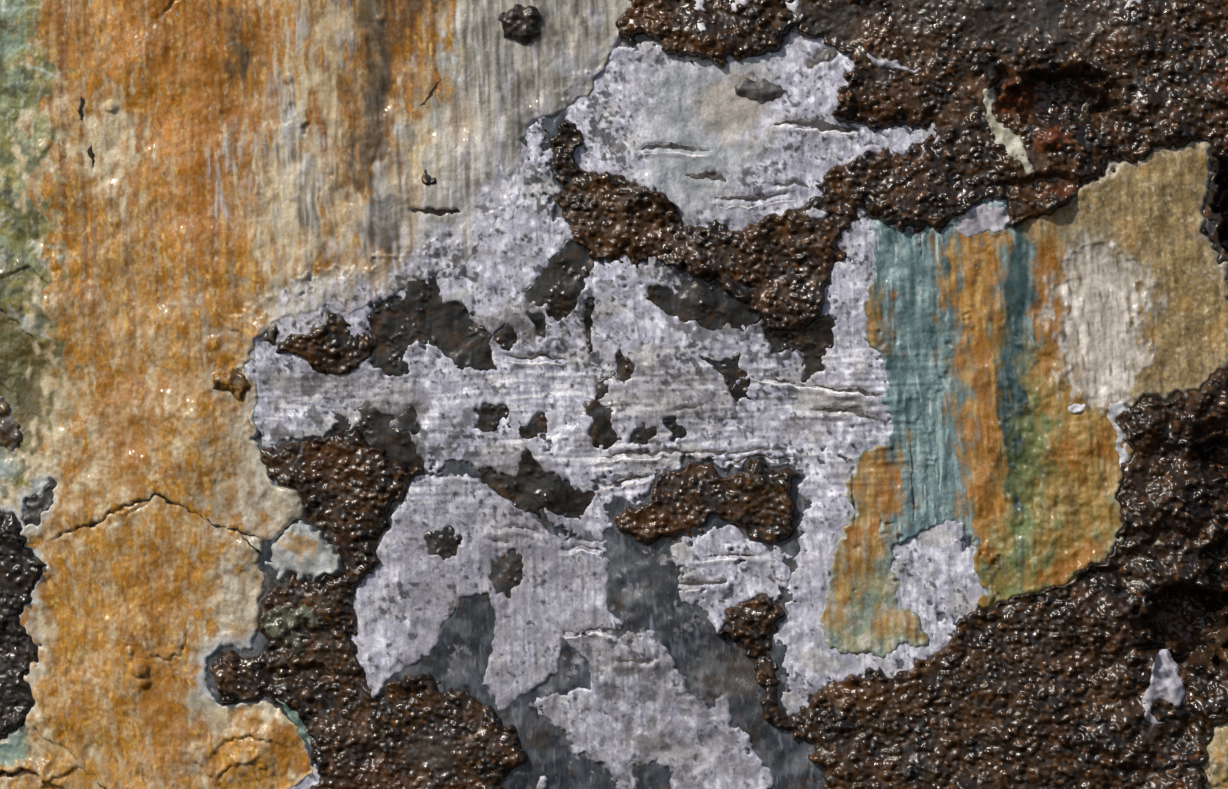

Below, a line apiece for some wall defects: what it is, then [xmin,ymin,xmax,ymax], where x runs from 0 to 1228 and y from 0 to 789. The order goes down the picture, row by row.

peeling [694,0,707,35]
peeling [731,0,749,12]
peeling [785,0,799,13]
peeling [565,29,940,236]
rust [0,0,528,789]
peeling [244,117,1010,789]
rust [543,0,1228,789]
peeling [1068,403,1086,414]
peeling [1107,401,1131,468]
crack [40,492,260,553]
crack [0,729,107,789]